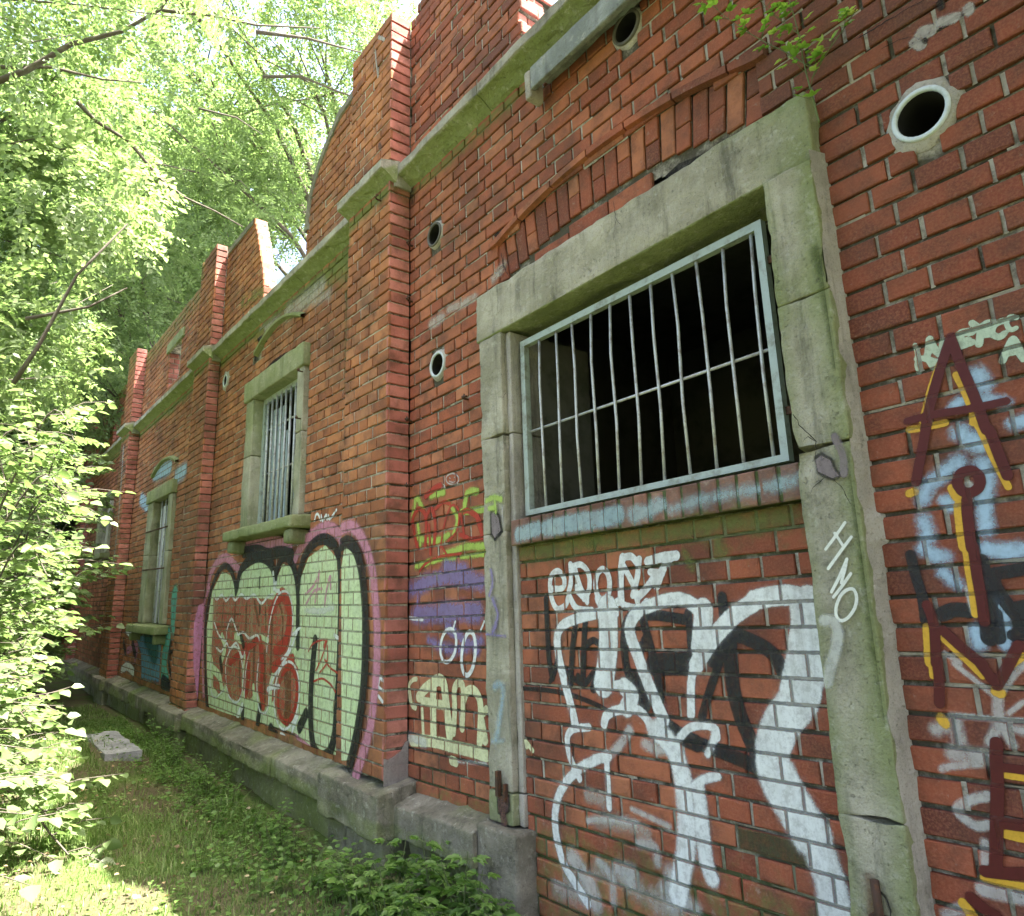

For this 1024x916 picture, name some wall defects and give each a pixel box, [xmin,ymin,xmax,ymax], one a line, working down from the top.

spalling [909,0,974,51]
water stain [429,295,475,328]
crack [793,414,851,504]
spalling [814,433,848,481]
corrosion [497,792,510,827]